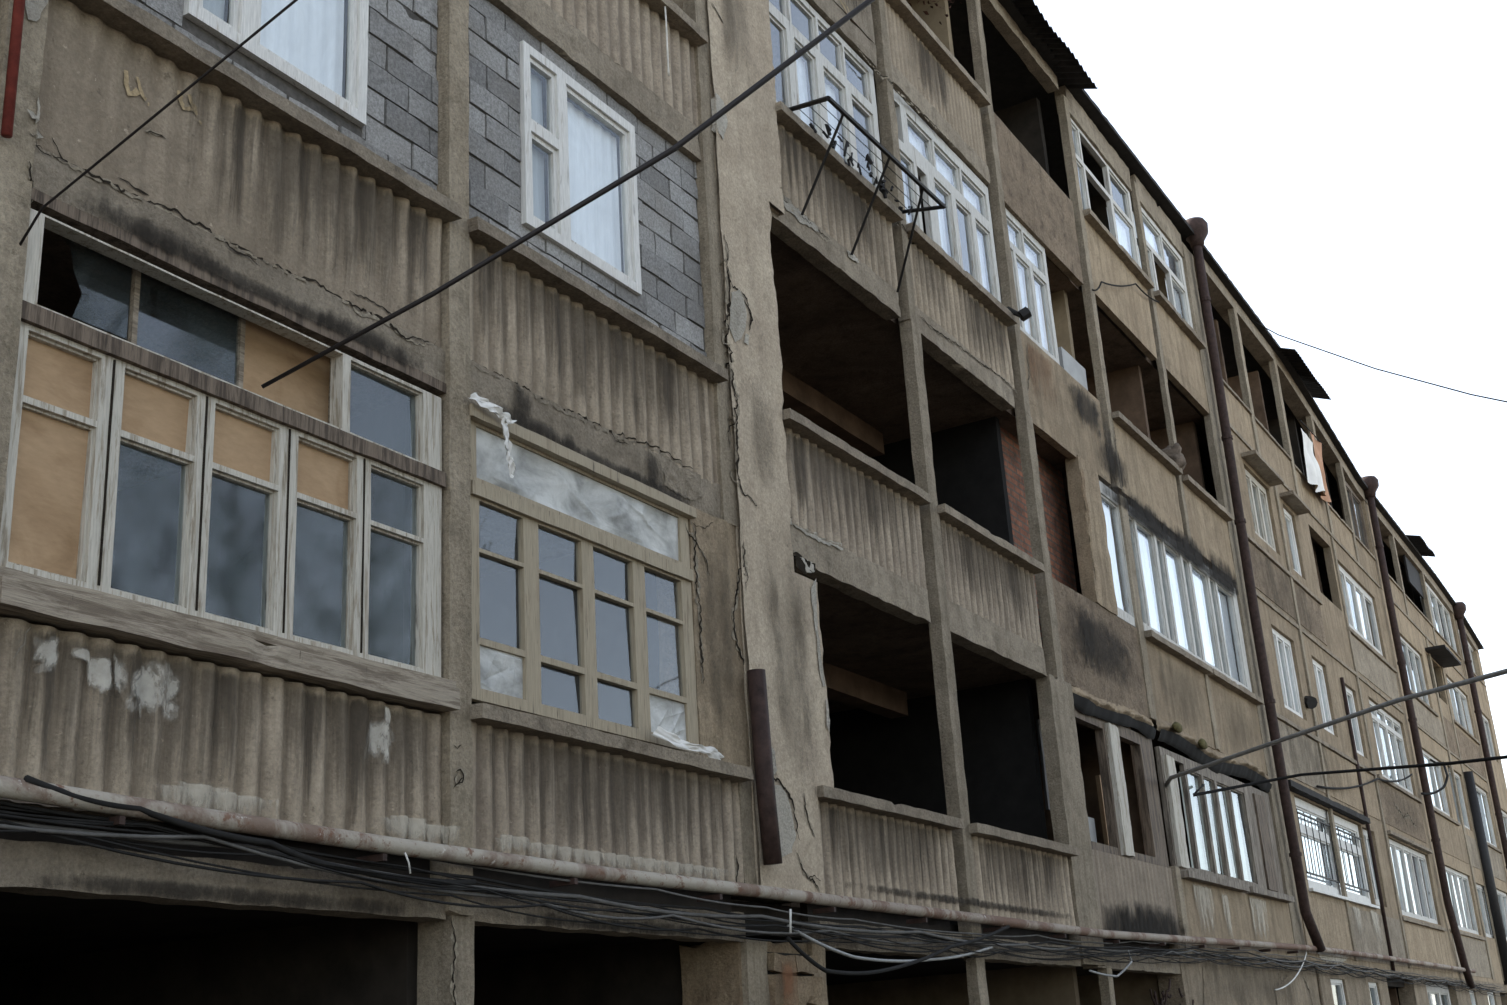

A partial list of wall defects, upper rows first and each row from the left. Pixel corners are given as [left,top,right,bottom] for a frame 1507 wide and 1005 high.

damp [105,206,213,267]
crack [27,132,435,346]
damp [319,311,407,363]
crack [720,234,757,506]
spalling [729,289,751,345]
crack [685,522,749,684]
peeling [38,641,56,664]
peeling [76,649,177,709]
damp [1072,607,1130,681]
peeling [370,708,390,755]
crack [771,745,821,891]
crack [450,918,460,1005]